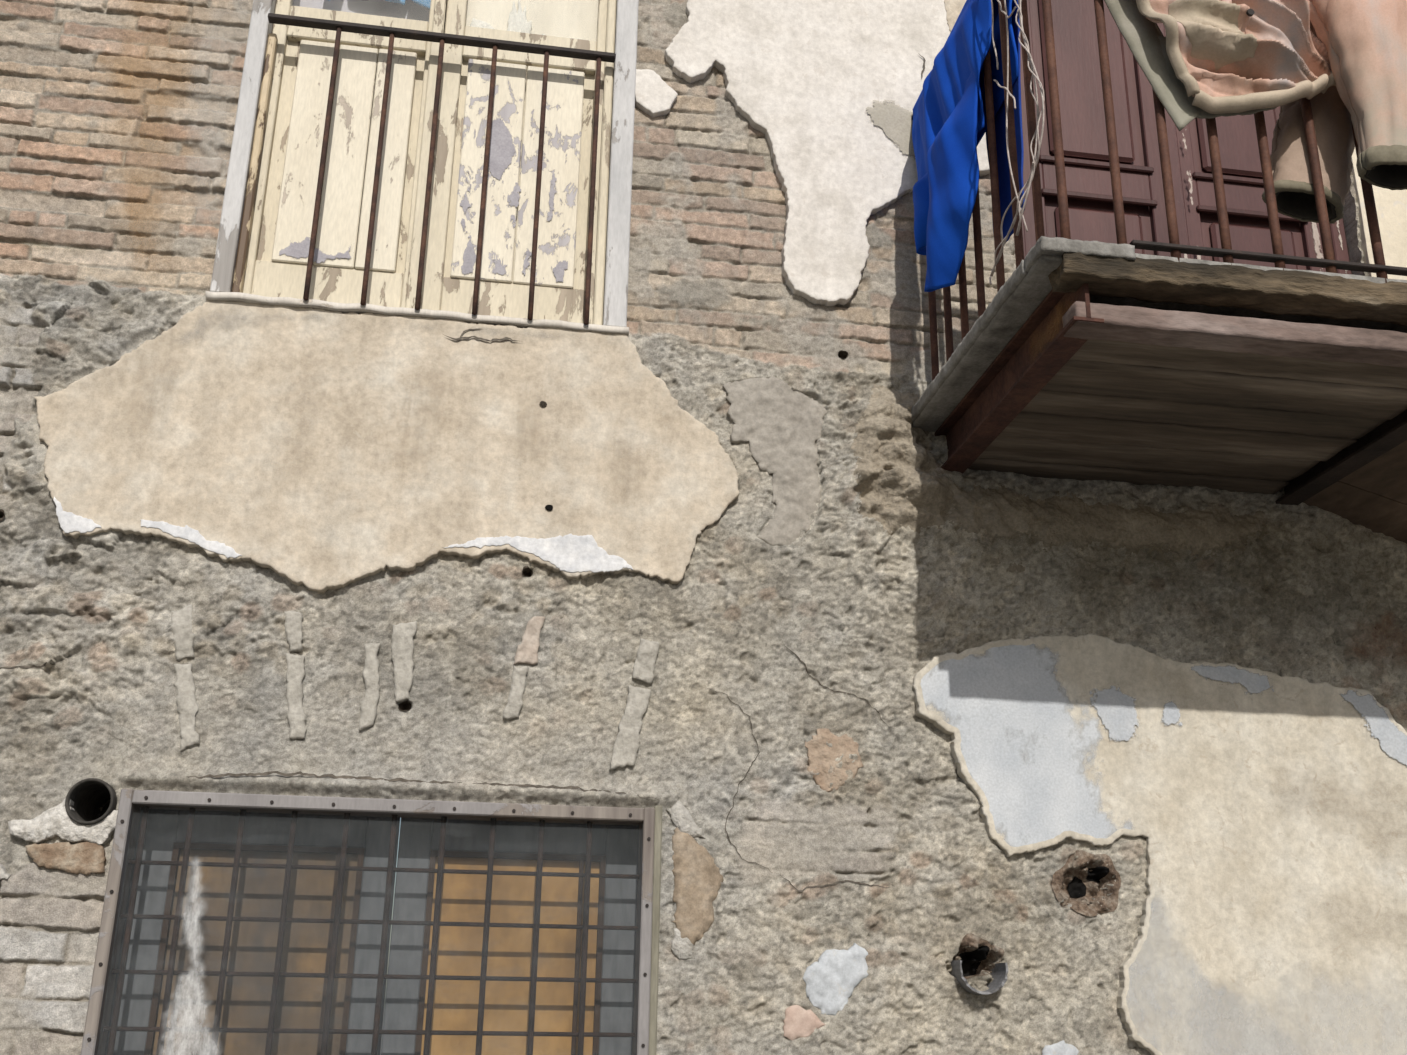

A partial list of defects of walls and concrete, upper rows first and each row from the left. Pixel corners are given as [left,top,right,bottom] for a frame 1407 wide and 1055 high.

flaking render [635,0,966,306]
flaking render [977,132,990,176]
flaking render [34,300,740,594]
flaking render [171,604,200,751]
flaking render [912,633,1407,1055]